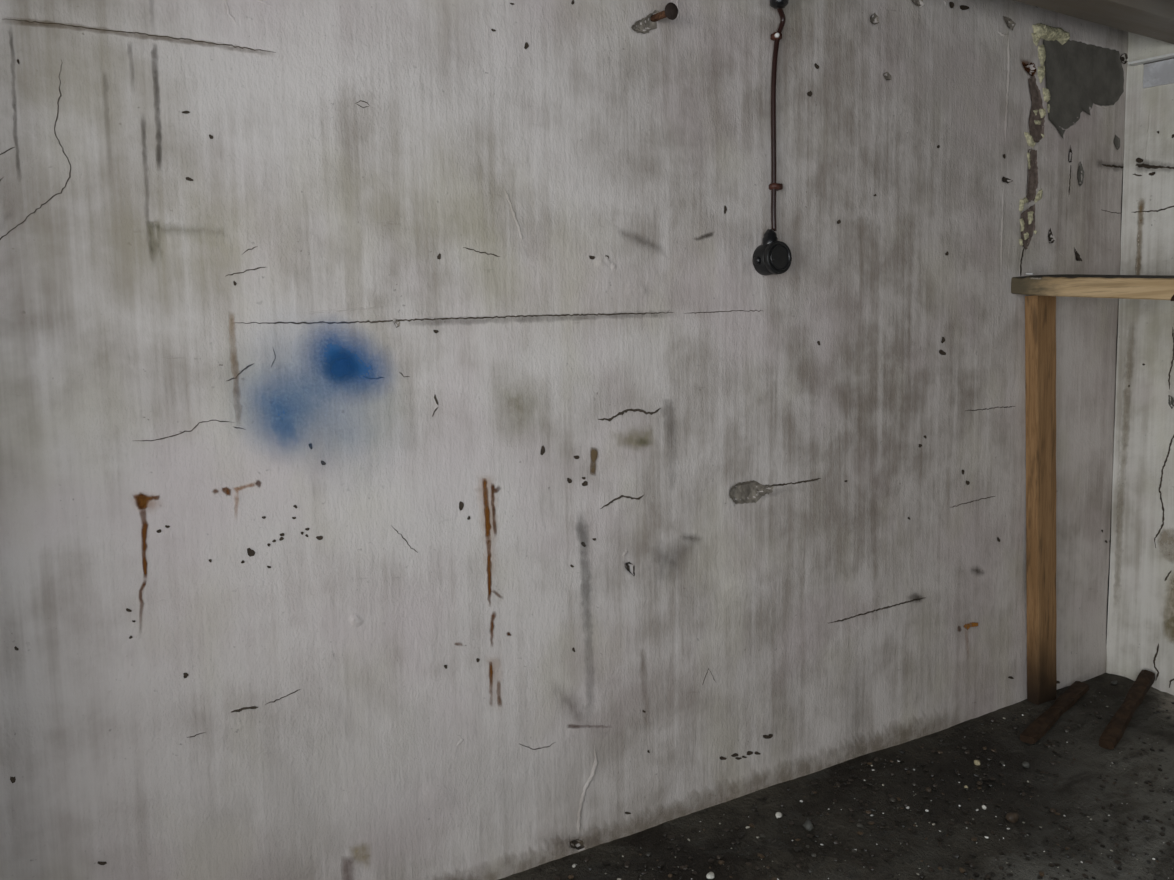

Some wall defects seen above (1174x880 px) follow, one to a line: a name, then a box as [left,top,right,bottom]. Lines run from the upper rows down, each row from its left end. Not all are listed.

crack [0,60,72,241]
peeling [1019,39,1128,261]
crack [1102,158,1174,177]
crack [1102,205,1174,214]
crack [1166,327,1174,390]
rust [135,494,159,606]
rust [483,480,500,639]
rust [590,449,598,474]
crack [1154,434,1174,581]
crack [1152,643,1174,688]